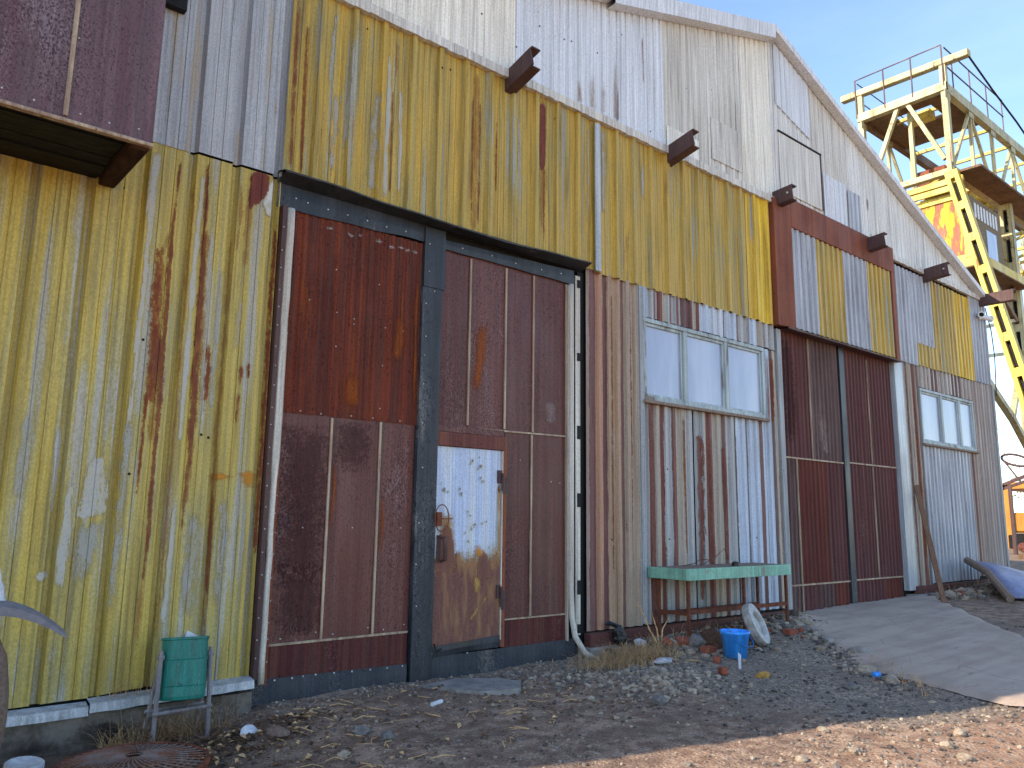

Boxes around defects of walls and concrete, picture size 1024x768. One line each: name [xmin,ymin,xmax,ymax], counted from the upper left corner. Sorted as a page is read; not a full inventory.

rust [248,171,270,210]
peeling [36,153,161,607]
rust [136,164,182,580]
rust [181,165,211,529]
rust [474,329,486,387]
rust [205,495,214,593]
peeling [432,511,500,647]